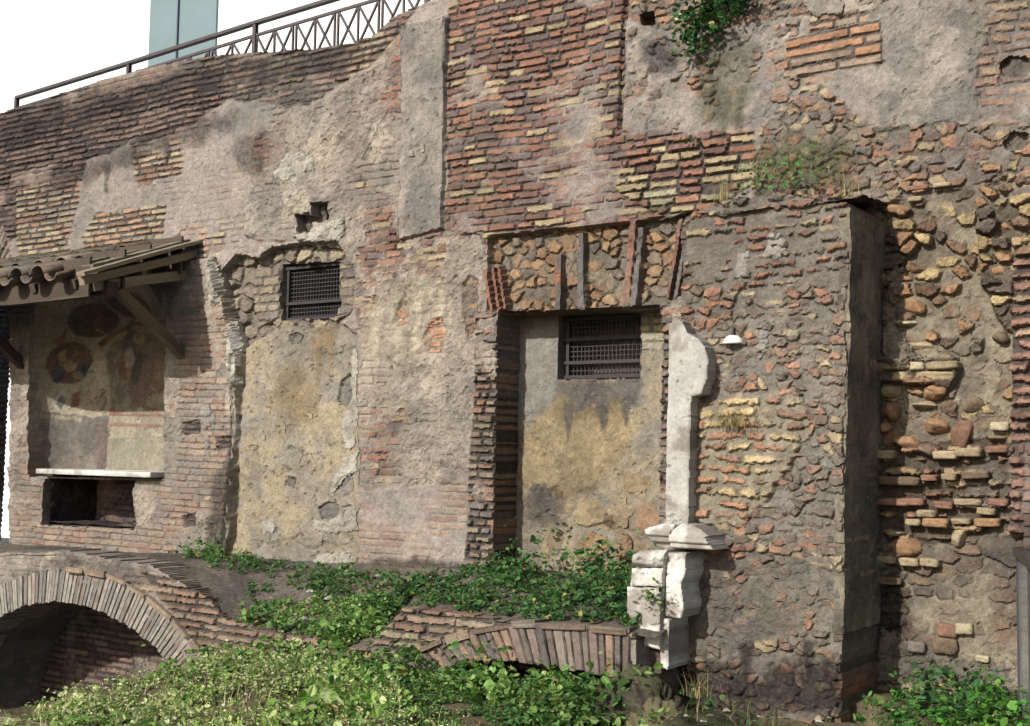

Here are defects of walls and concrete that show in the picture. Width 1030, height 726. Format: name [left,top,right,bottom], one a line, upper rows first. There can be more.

water stain [559,379,639,429]